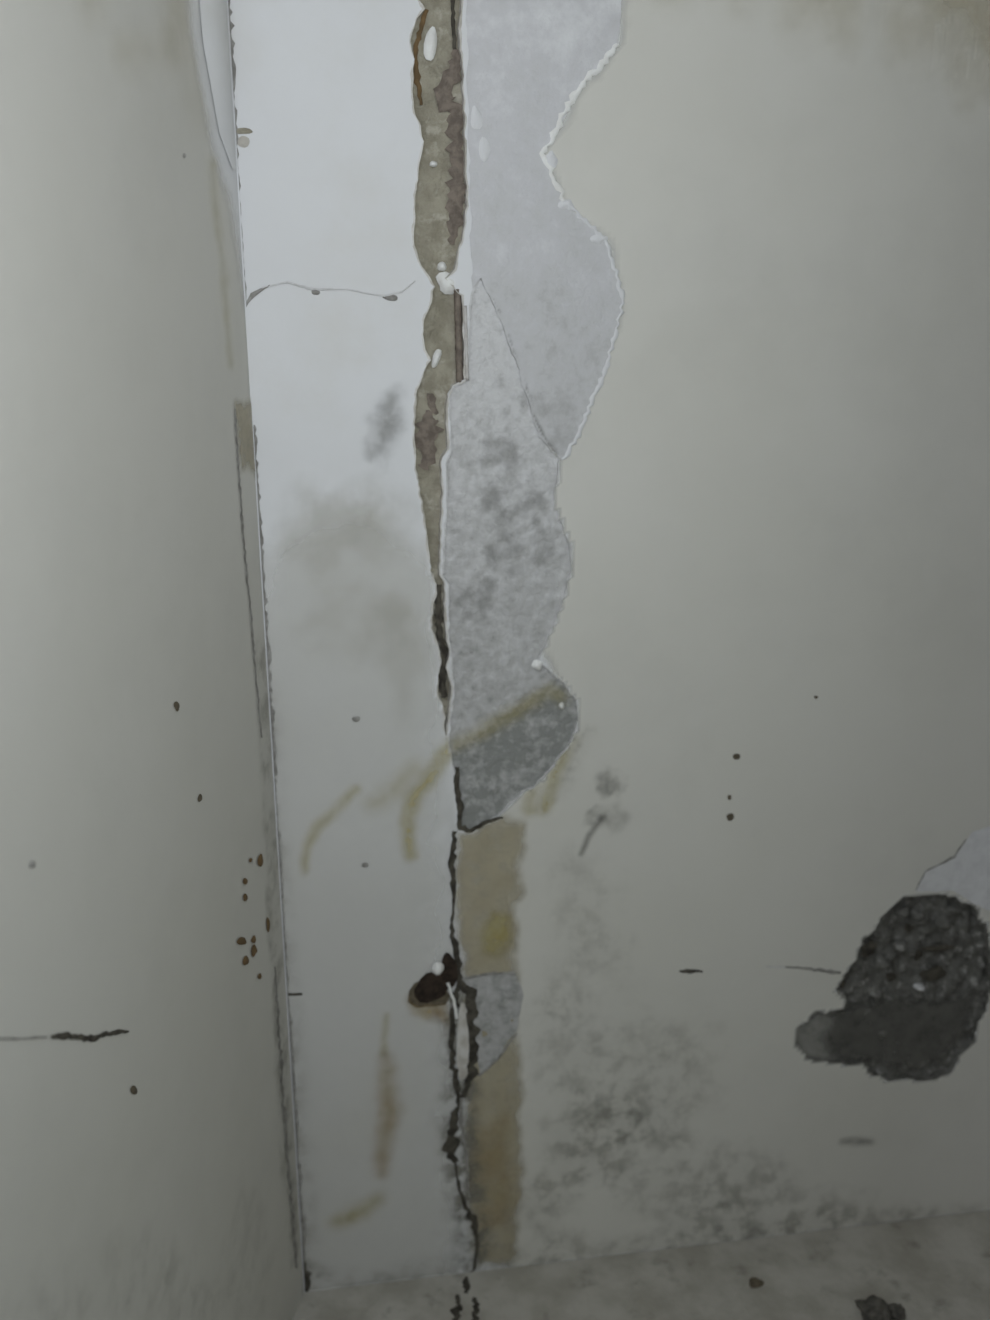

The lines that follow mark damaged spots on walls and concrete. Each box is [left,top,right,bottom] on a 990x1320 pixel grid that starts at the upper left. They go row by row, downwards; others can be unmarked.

crack [0,1029,129,1042]
corrosion [237,917,270,979]
crack [234,404,312,1292]
crack [228,0,469,737]
crack [441,831,481,1320]
spalling [408,953,524,1077]
spalling [442,0,625,833]
damp [457,0,990,1267]
spalling [795,826,990,1082]